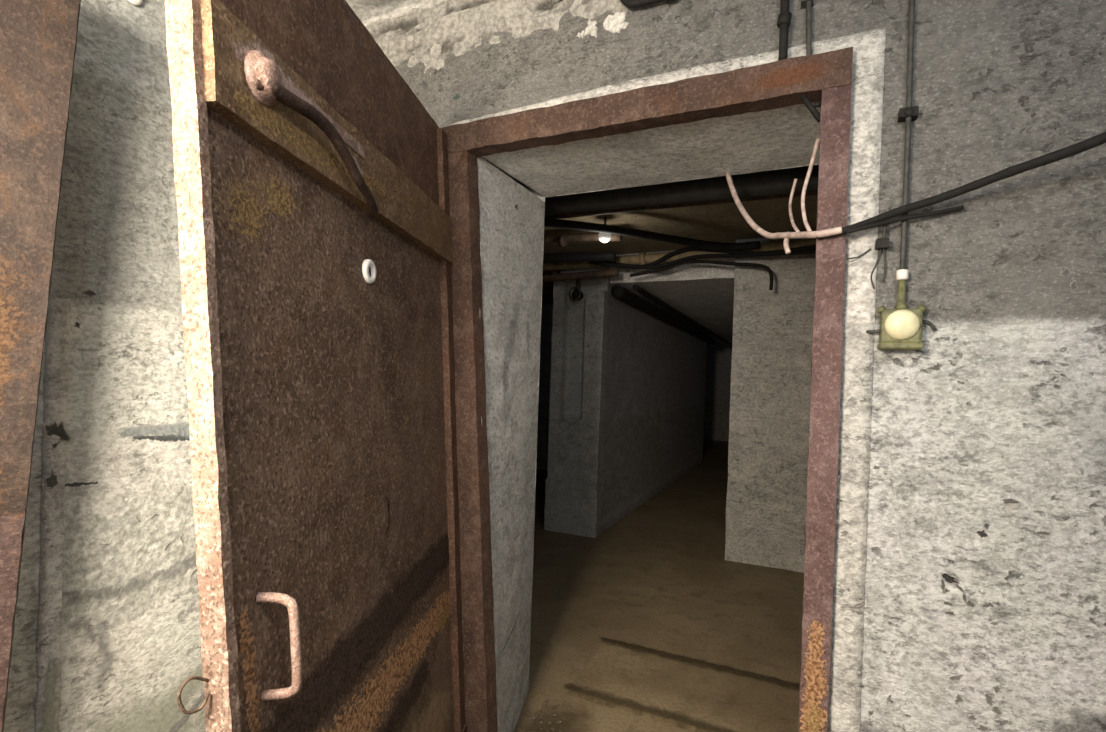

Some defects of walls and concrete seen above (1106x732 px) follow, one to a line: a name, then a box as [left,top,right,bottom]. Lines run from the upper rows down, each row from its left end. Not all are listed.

flaking render [365,0,628,76]
rust [799,620,828,732]